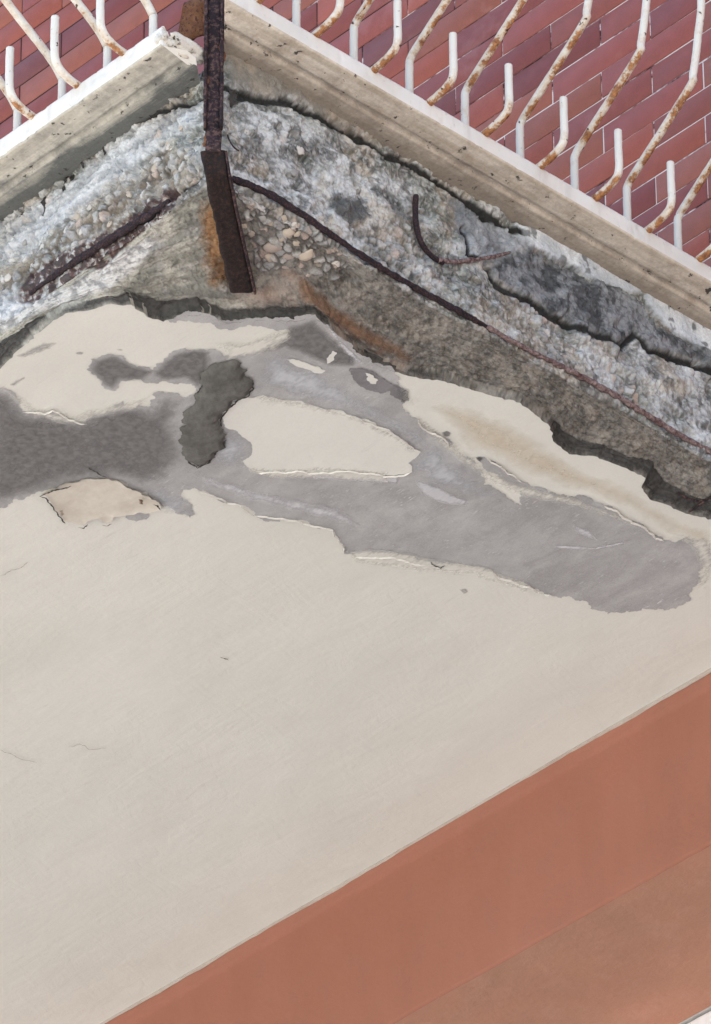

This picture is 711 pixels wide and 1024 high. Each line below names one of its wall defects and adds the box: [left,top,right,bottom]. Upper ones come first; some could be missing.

rust [203,206,227,282]
rust [300,282,410,360]
peeling [0,86,711,614]
crack [223,86,711,375]